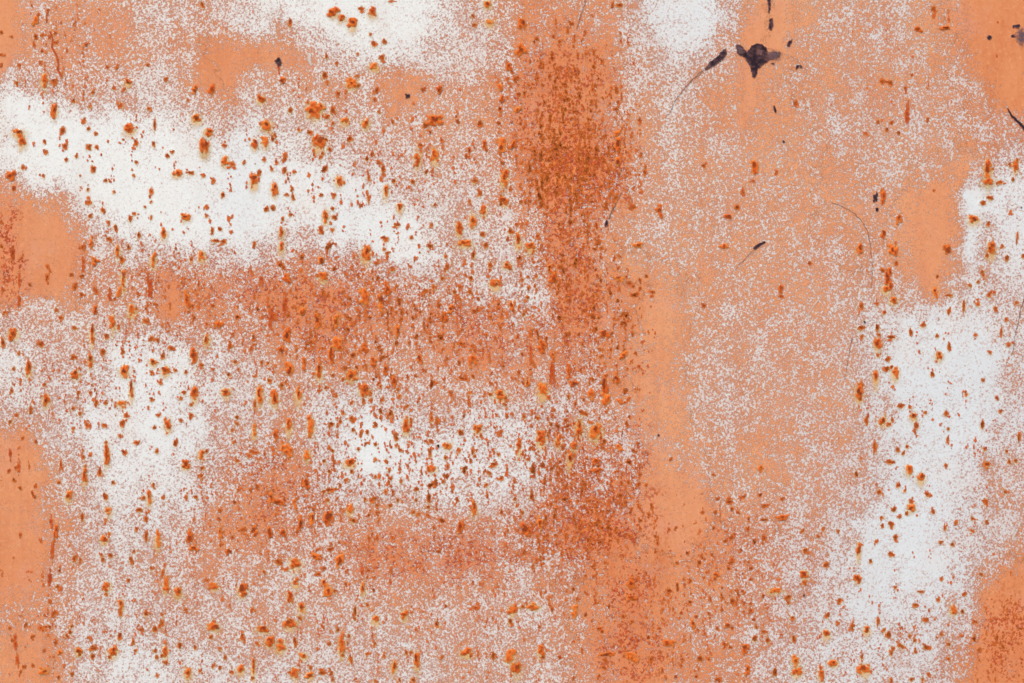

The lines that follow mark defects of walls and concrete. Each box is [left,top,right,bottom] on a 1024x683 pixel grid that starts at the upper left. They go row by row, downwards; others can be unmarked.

corrosion [326,6,376,31]
corrosion [6,128,48,155]
corrosion [58,126,102,173]
corrosion [152,141,216,185]
corrosion [221,156,246,198]
corrosion [245,156,266,190]
corrosion [269,150,297,200]
corrosion [317,192,343,235]
corrosion [962,214,1024,342]
corrosion [880,497,918,543]
corrosion [904,432,1024,683]
corrosion [872,602,937,683]